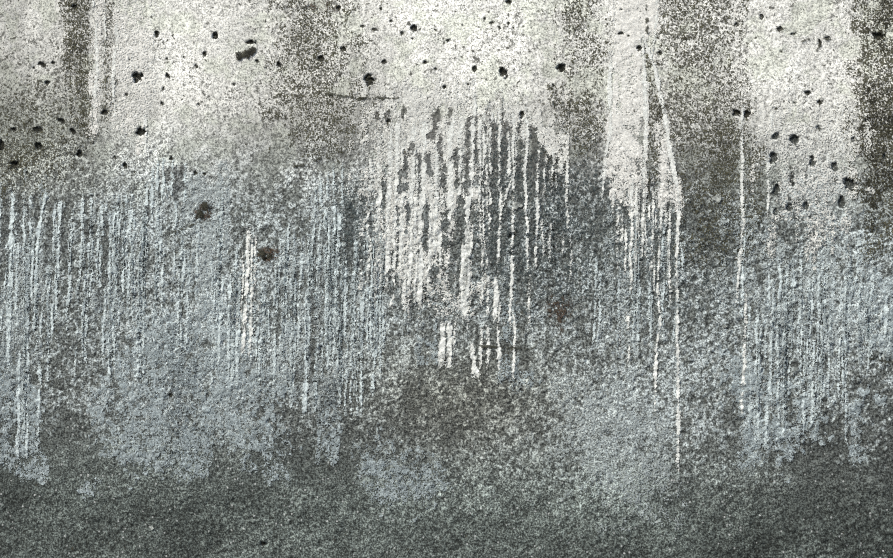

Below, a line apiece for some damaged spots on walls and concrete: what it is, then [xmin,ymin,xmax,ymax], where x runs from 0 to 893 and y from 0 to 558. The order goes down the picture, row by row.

leakage [0,0,157,460]
leakage [74,0,893,472]